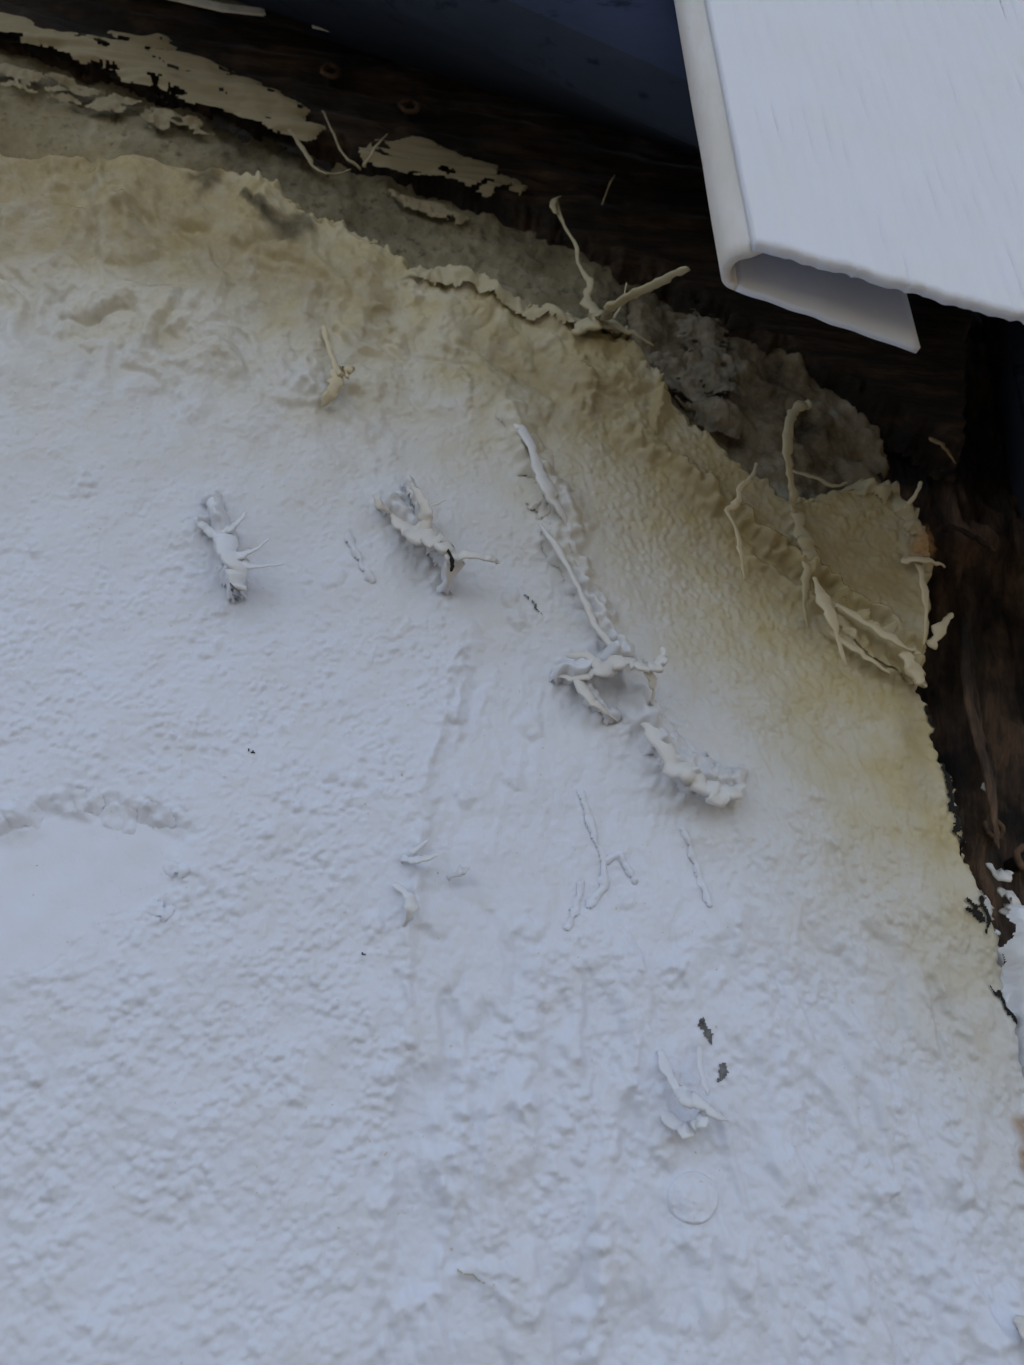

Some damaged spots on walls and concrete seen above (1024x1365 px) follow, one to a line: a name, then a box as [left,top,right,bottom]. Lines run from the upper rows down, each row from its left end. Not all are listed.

water stain [241,189,308,239]
spalling [0,12,928,692]
peeling [549,634,669,726]